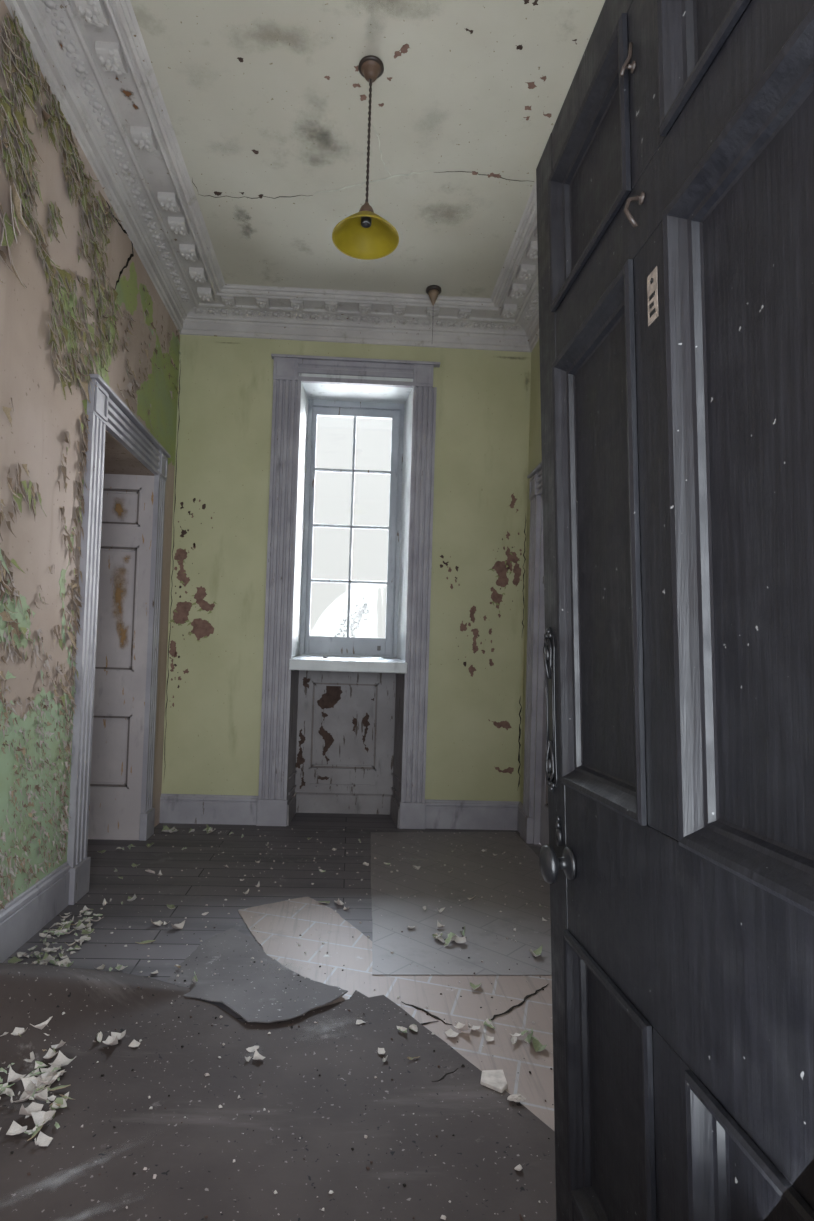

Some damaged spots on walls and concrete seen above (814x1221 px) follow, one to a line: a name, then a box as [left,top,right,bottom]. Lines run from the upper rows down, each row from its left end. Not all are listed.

crack [192,124,534,199]
peeling [169,498,217,707]
peeling [458,531,522,677]
peeling [296,677,343,789]
peeling [352,698,374,753]
peeling [488,719,512,730]
peeling [8,906,103,967]